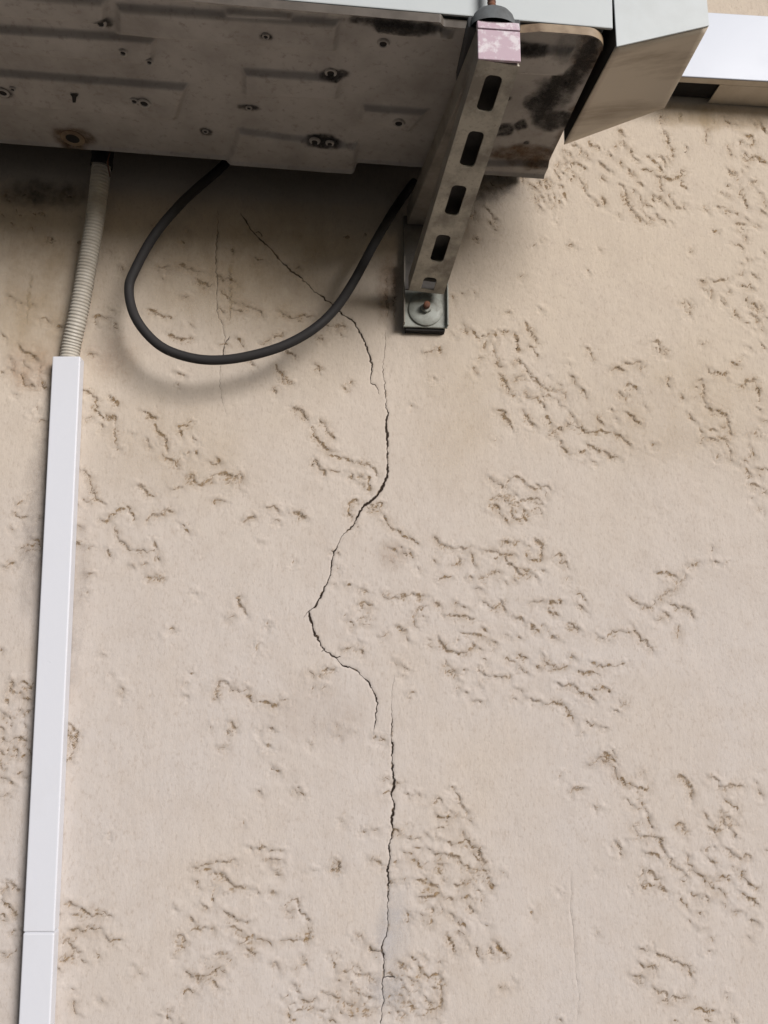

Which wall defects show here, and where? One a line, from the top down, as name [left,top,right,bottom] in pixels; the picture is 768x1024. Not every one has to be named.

crack [241,215,396,1024]